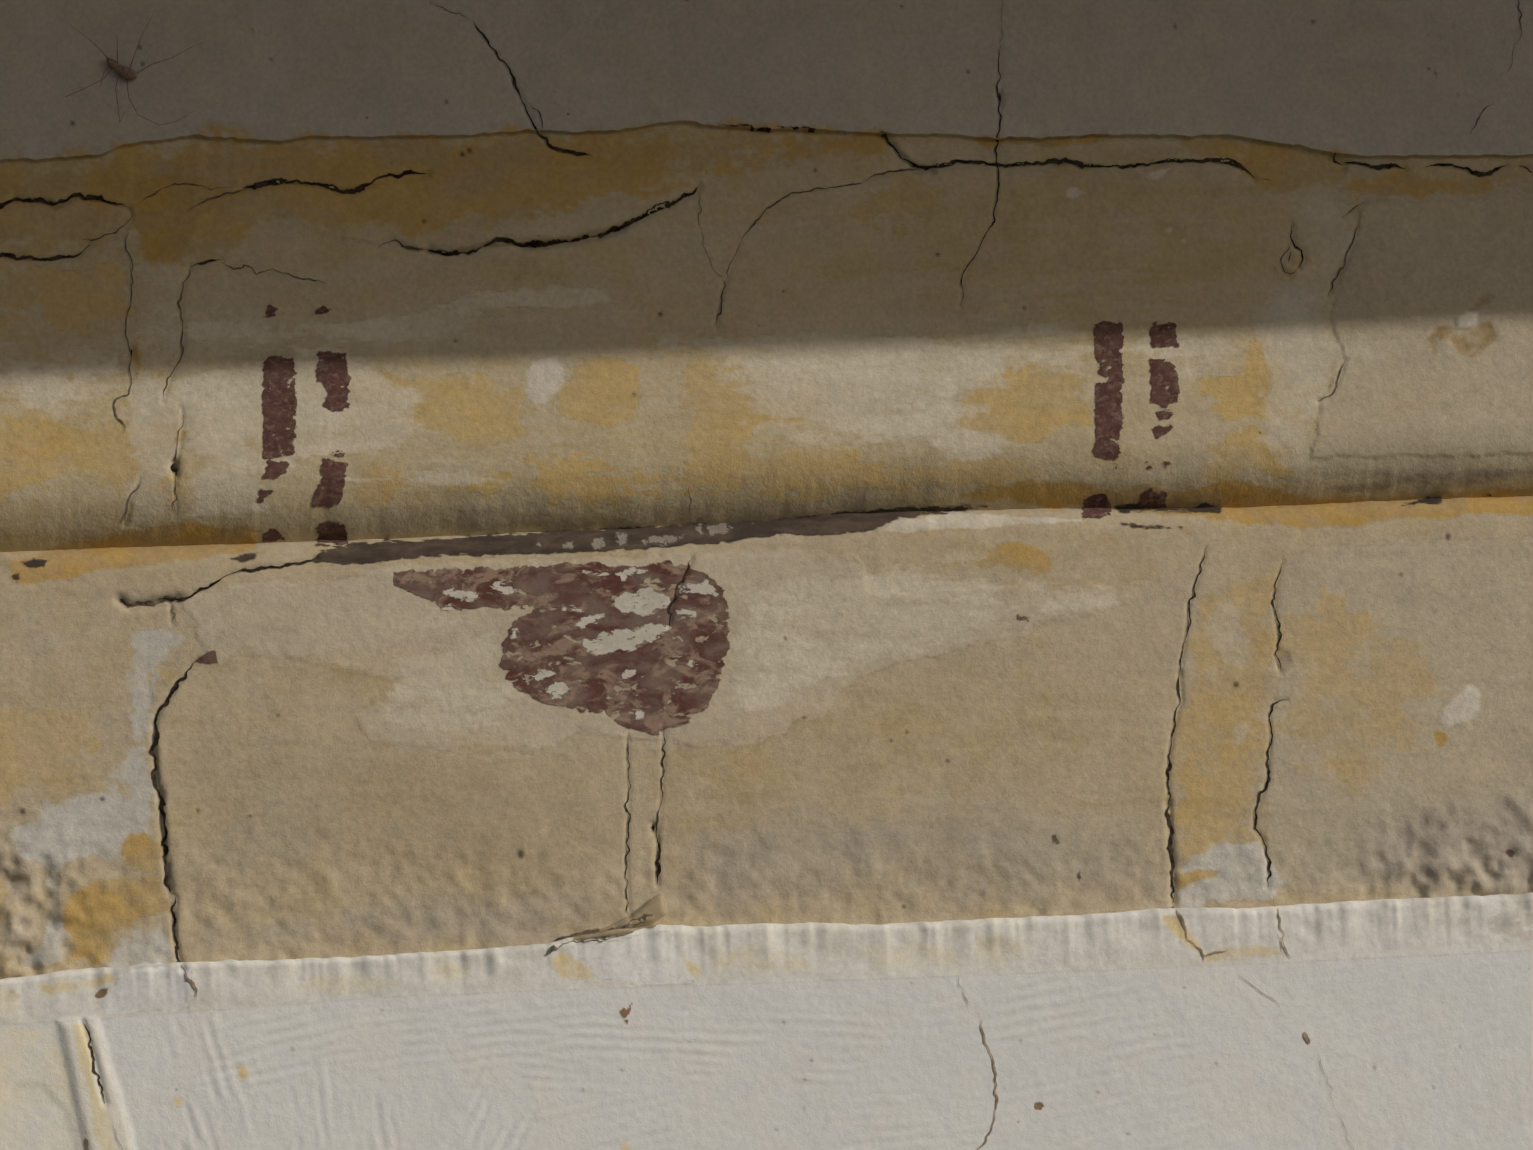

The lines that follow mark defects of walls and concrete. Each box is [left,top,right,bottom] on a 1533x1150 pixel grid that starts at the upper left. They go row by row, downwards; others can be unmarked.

leakage [0,111,949,370]
crack [377,1,1271,325]
leakage [1176,134,1498,217]
leakage [0,472,261,587]
crack [120,557,317,621]
peeling [442,581,518,611]
peeling [523,669,570,700]
peeling [562,566,718,629]
leakage [162,323,1533,531]
crack [149,660,198,995]
leakage [0,702,618,1019]
crack [1165,548,1354,1150]